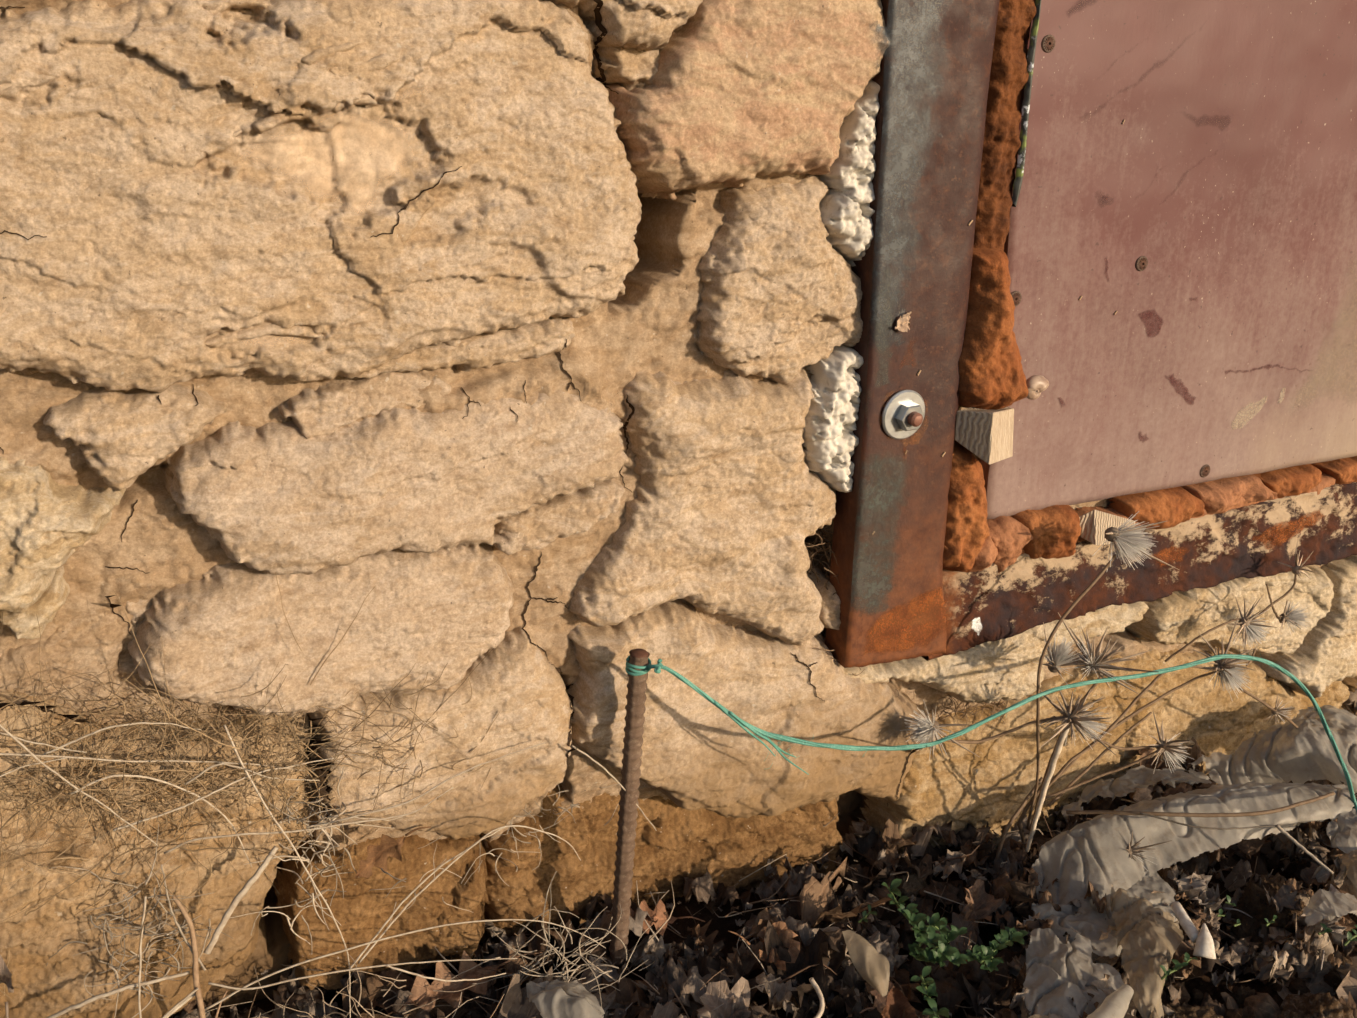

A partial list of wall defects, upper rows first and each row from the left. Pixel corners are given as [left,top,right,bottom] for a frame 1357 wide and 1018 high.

crack [593,0,619,94]
corrosion [1254,511,1324,548]
crack [522,552,577,779]